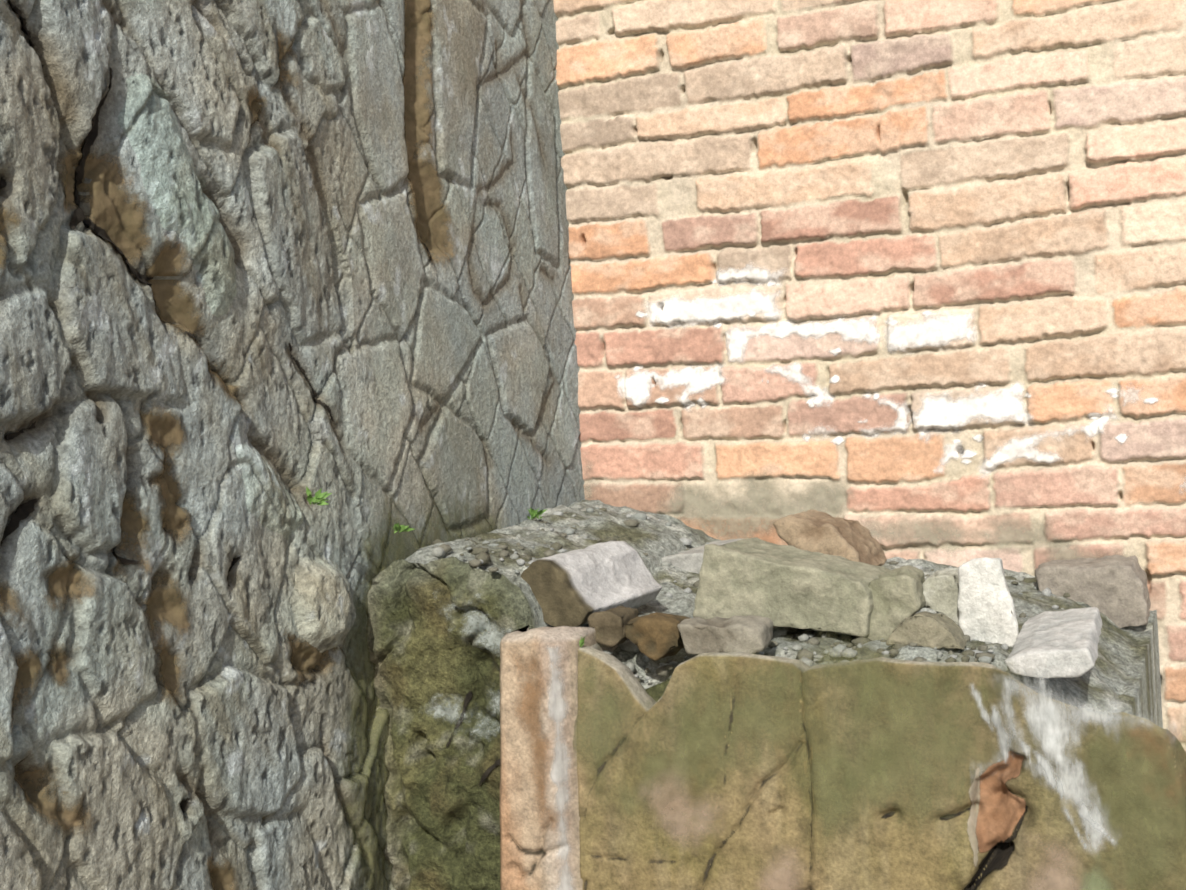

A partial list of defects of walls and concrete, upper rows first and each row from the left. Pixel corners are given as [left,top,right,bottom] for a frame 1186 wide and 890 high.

crack [69,67,196,341]
water stain [615,266,976,409]
water stain [803,427,845,445]
water stain [859,383,1158,474]
crack [596,718,641,777]
crack [584,855,675,890]
crack [703,774,776,882]
crack [940,807,971,820]
water stain [975,680,1017,761]
crack [964,789,1028,890]
spalling [971,751,1026,853]
water stain [1022,682,1114,846]